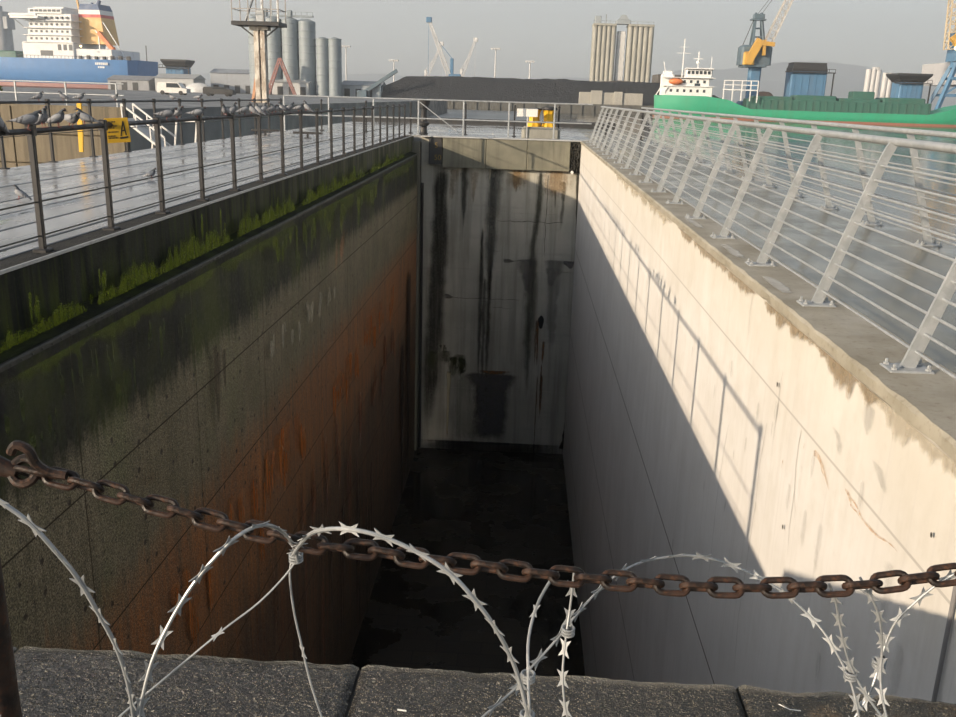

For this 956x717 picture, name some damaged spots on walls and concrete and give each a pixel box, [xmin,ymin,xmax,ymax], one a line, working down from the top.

damp [424,169,565,454]
damp [555,174,579,224]